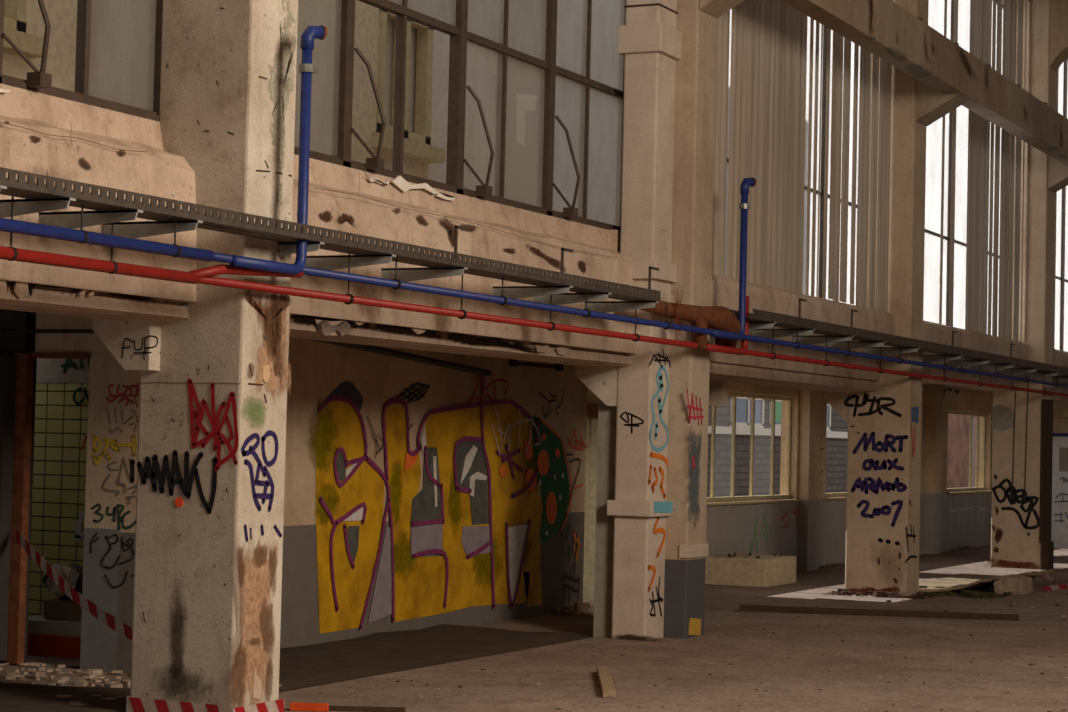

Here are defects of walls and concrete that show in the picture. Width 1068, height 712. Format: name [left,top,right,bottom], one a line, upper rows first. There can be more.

peeling [363,171,456,201]
flaking render [320,210,355,227]
flaking render [417,215,477,247]
flaking render [527,244,566,272]
flaking render [248,293,569,403]
flaking render [232,542,277,708]
water stain [161,598,198,696]